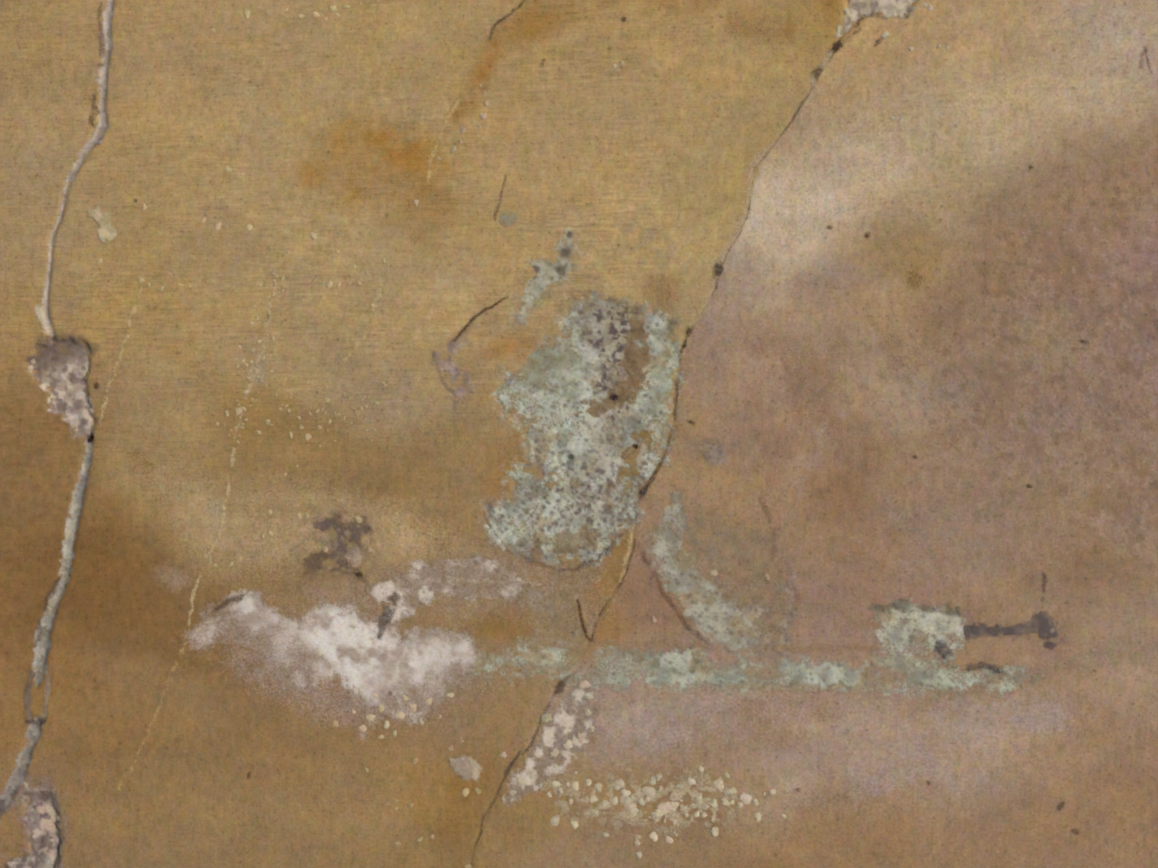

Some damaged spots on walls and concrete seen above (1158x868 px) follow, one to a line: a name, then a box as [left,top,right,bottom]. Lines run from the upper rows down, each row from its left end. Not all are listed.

crack [488,0,525,40]
flaking render [835,0,933,47]
crack [34,0,115,337]
flaking render [25,331,101,444]
crack [0,286,142,817]
leakage [0,333,625,749]
crack [448,296,506,345]
peeling [478,223,695,578]
crack [471,28,861,867]
flaking render [0,764,72,868]
flaking render [448,739,483,797]
peeling [469,572,1158,859]